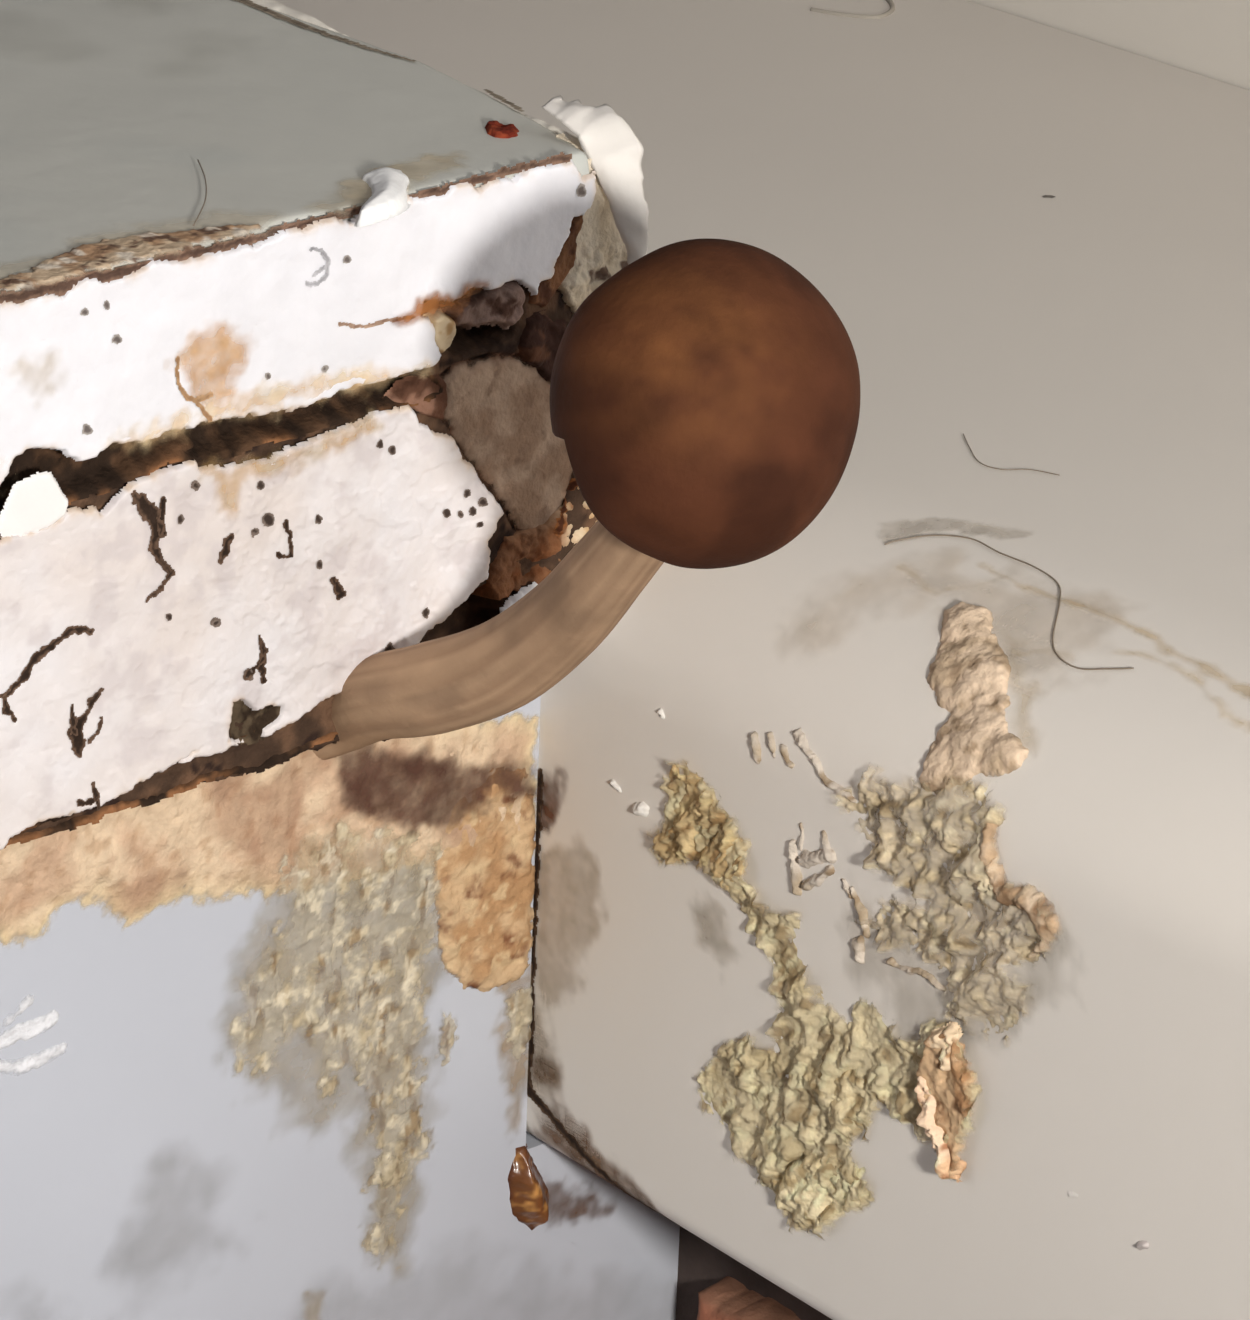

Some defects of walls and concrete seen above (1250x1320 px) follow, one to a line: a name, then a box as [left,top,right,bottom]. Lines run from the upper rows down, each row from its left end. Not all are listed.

spalling [384,95,649,600]
peeling [0,471,68,538]
crack [0,356,443,603]
crack [0,625,95,723]
crack [4,688,338,849]
spalling [229,699,281,745]
crack [244,634,269,684]
leakage [0,995,66,1074]
peeling [0,713,538,1255]
leakage [233,862,439,1083]
peeling [632,727,1059,1238]
leakage [355,1101,415,1244]